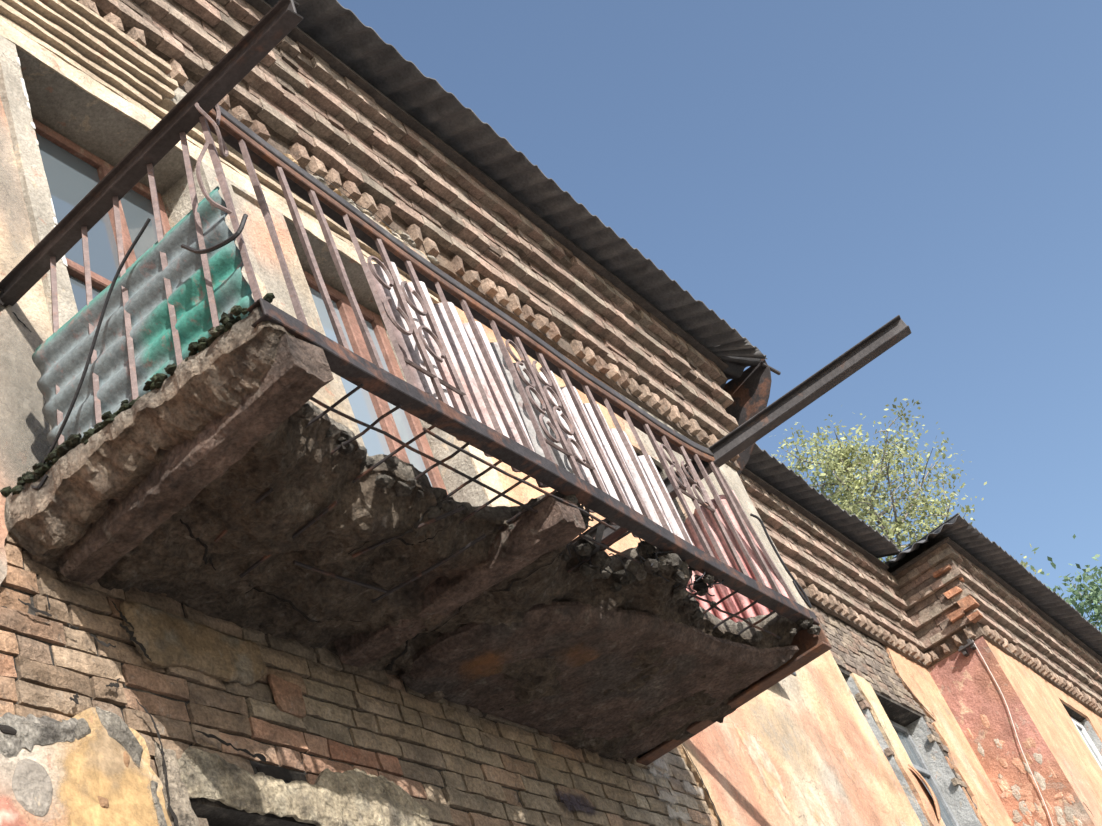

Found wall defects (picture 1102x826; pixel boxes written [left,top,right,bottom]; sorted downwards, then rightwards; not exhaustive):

crack [180,519,216,571]
flaking render [0,533,717,826]
peeling [735,727,791,818]
flaking render [908,764,941,820]